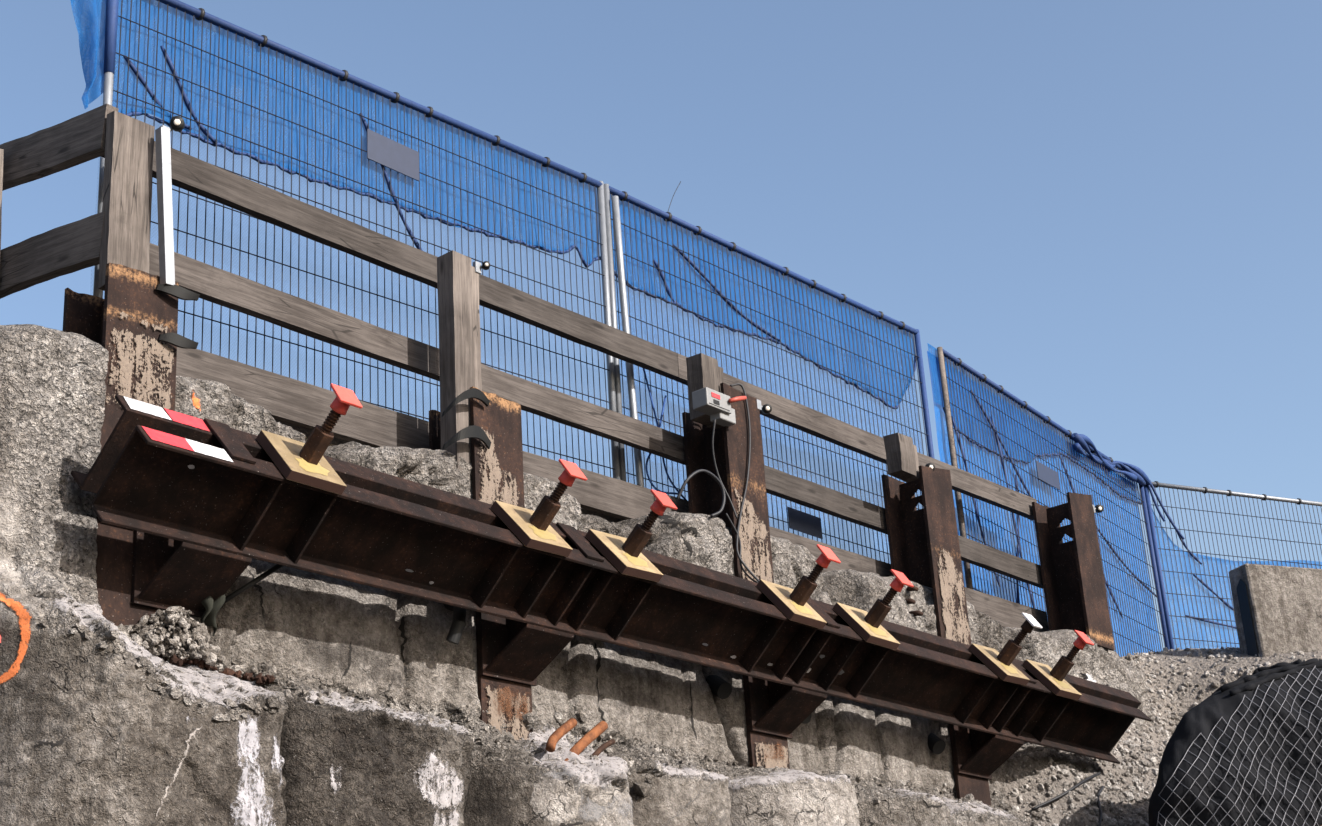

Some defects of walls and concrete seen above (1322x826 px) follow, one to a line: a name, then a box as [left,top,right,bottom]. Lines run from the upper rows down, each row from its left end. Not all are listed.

spalling [37,591,283,722]
crack [398,615,408,678]
efflorescence [231,718,284,826]
efflorescence [415,750,464,826]
spalling [306,673,1017,826]